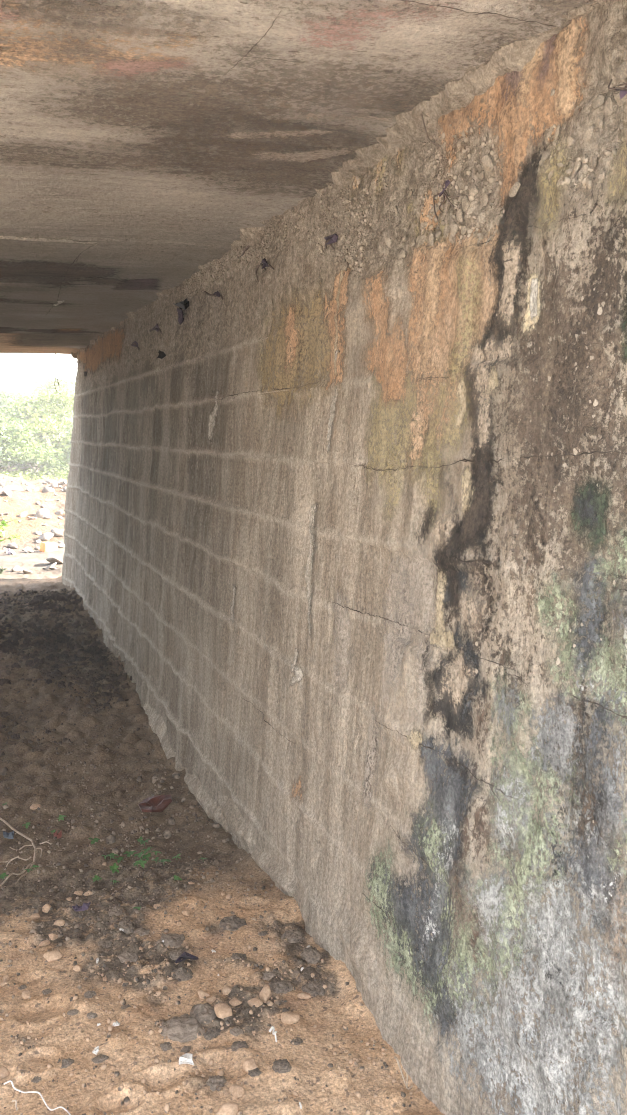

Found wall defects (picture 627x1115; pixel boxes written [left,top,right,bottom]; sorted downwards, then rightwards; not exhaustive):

damp [0,0,596,197]
spalling [539,22,627,193]
crack [349,451,627,479]
damp [334,594,351,688]
damp [363,142,627,984]